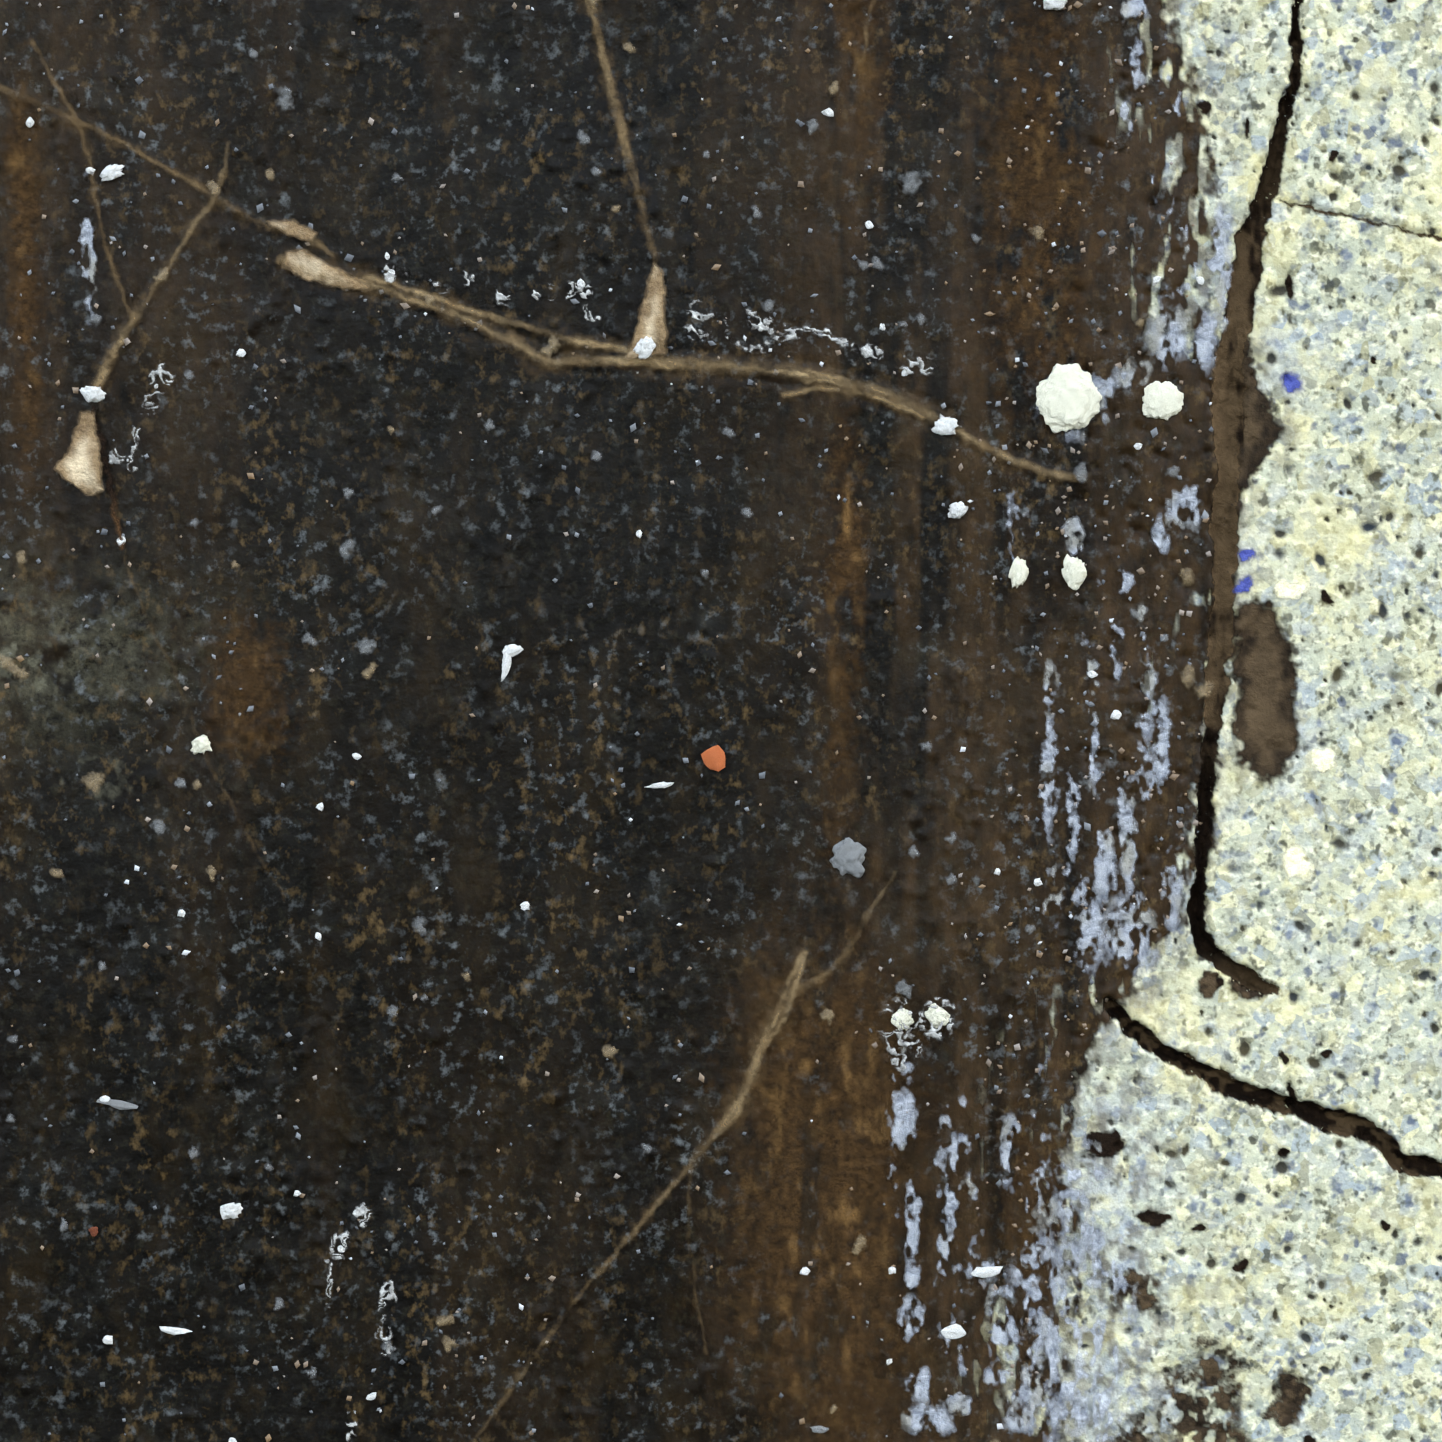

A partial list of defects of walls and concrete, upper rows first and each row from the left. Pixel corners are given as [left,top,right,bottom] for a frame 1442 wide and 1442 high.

leakage [1204,145,1216,194]
leakage [1198,200,1233,309]
crack [350,276,735,370]
leakage [752,316,772,331]
crack [776,369,930,419]
crack [1187,0,1442,995]
spalling [1231,600,1299,783]
crack [710,952,806,1139]
crack [1104,996,1442,1178]
leakage [945,1185,958,1229]
leakage [1060,1189,1126,1291]
leakage [1048,1317,1106,1442]